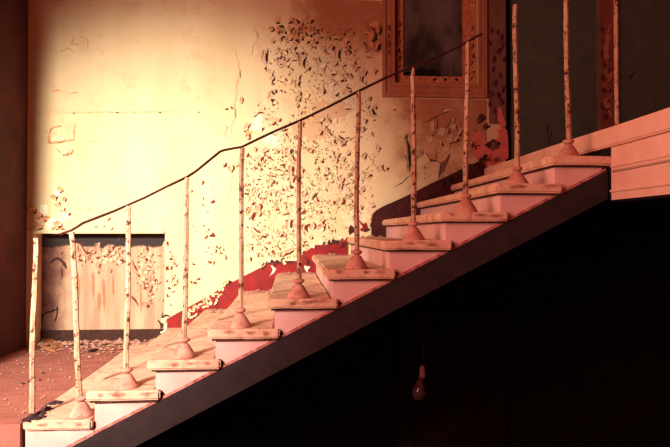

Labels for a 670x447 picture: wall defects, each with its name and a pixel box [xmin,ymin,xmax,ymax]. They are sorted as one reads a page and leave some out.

peeling [29,187,71,235]
peeling [76,241,179,309]
crack [223,22,258,214]
peeling [223,16,402,274]
spalling [417,28,509,191]